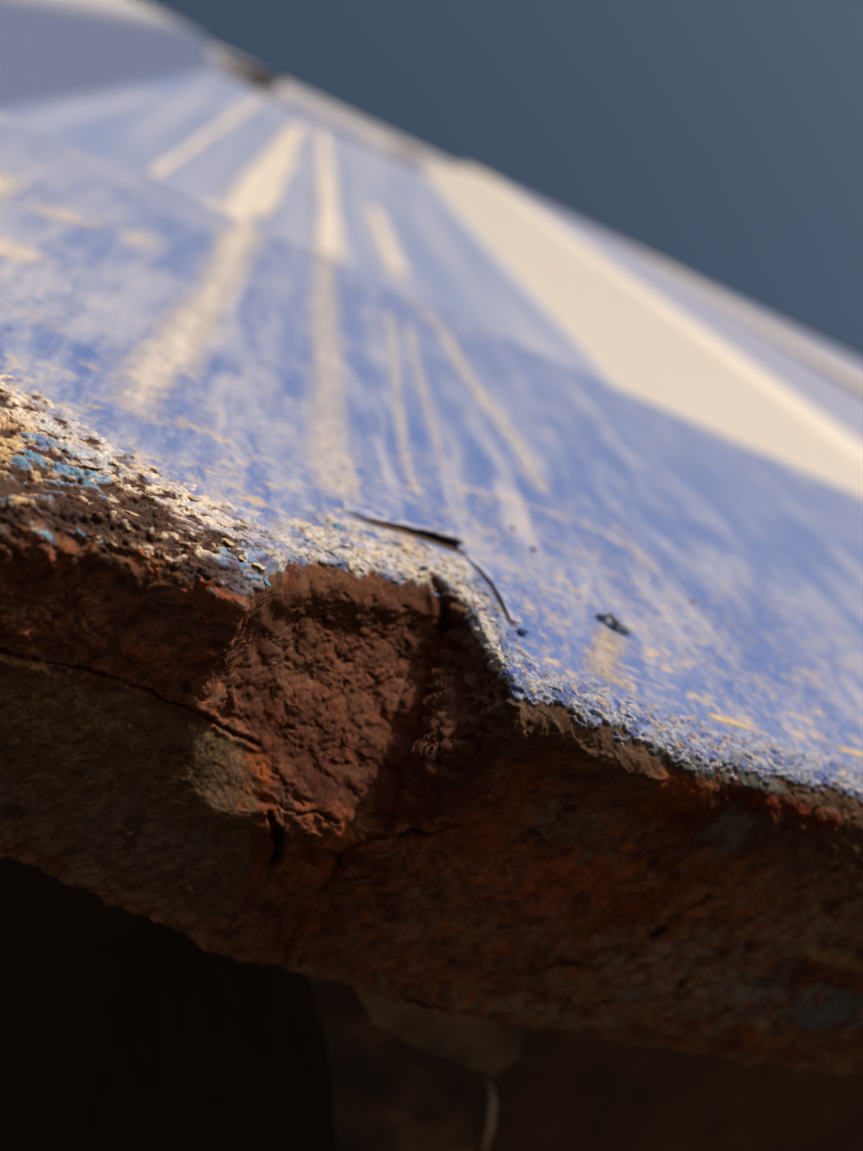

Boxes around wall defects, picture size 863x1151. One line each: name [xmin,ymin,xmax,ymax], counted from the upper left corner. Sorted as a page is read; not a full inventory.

peeling [0,371,863,802]
crack [430,577,448,606]
crack [50,662,252,744]
crack [268,810,336,859]